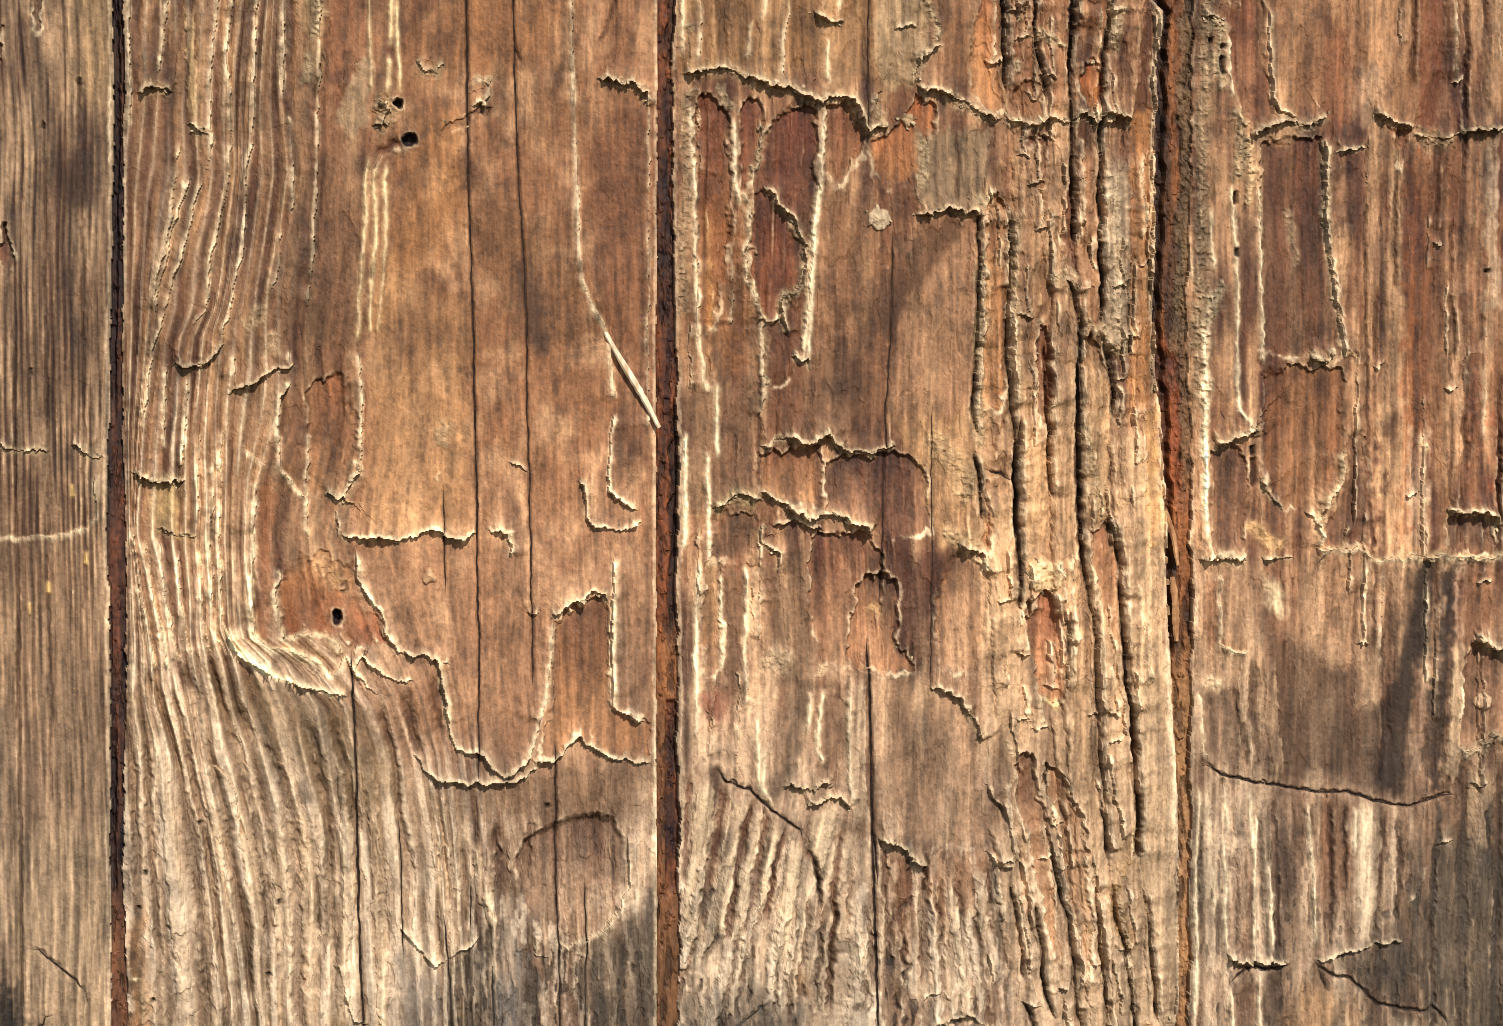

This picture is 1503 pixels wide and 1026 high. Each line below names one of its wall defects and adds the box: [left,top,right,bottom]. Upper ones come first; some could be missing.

spalling [680,0,1163,434]
spalling [1198,0,1503,568]
spalling [305,371,363,504]
spalling [270,524,653,788]
spalling [700,426,997,743]
spalling [1024,590,1071,705]
spalling [1090,519,1130,648]
spalling [1453,631,1503,762]
crack [716,767,803,840]
crack [866,643,879,1026]
crack [1200,764,1453,806]
crack [1231,959,1449,1026]